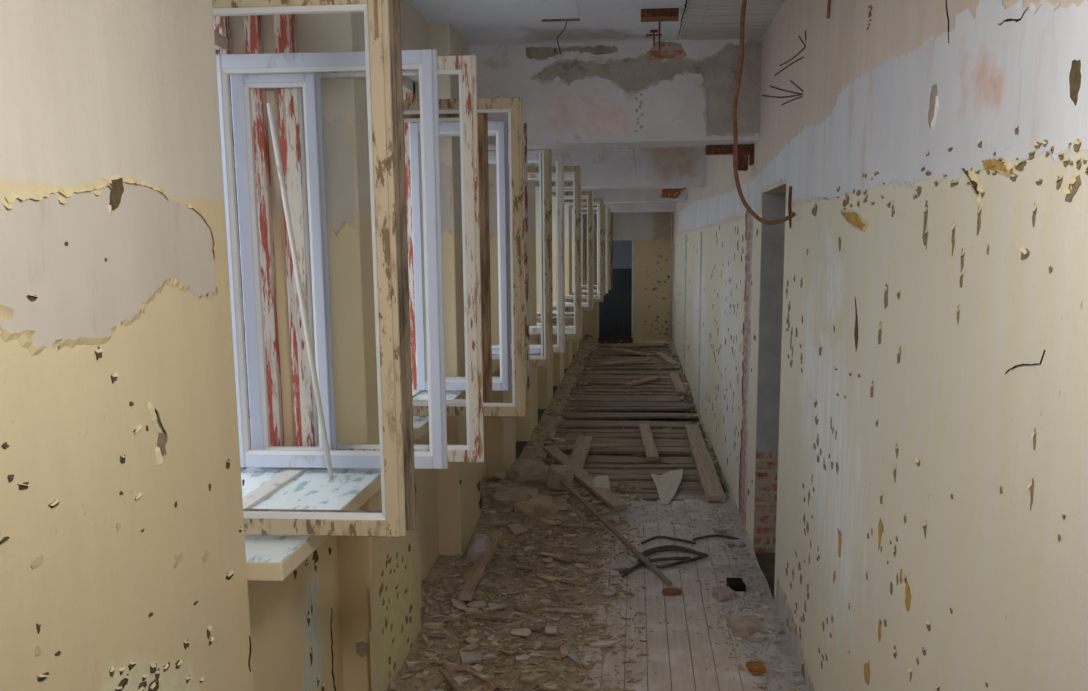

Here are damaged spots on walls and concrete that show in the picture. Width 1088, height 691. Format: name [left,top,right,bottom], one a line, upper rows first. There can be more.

flaking render [526,39,762,137]
peeling [0,174,218,360]
peeling [645,0,1088,691]
crack [1005,350,1046,374]
spalling [109,639,204,691]
spalling [379,544,413,678]